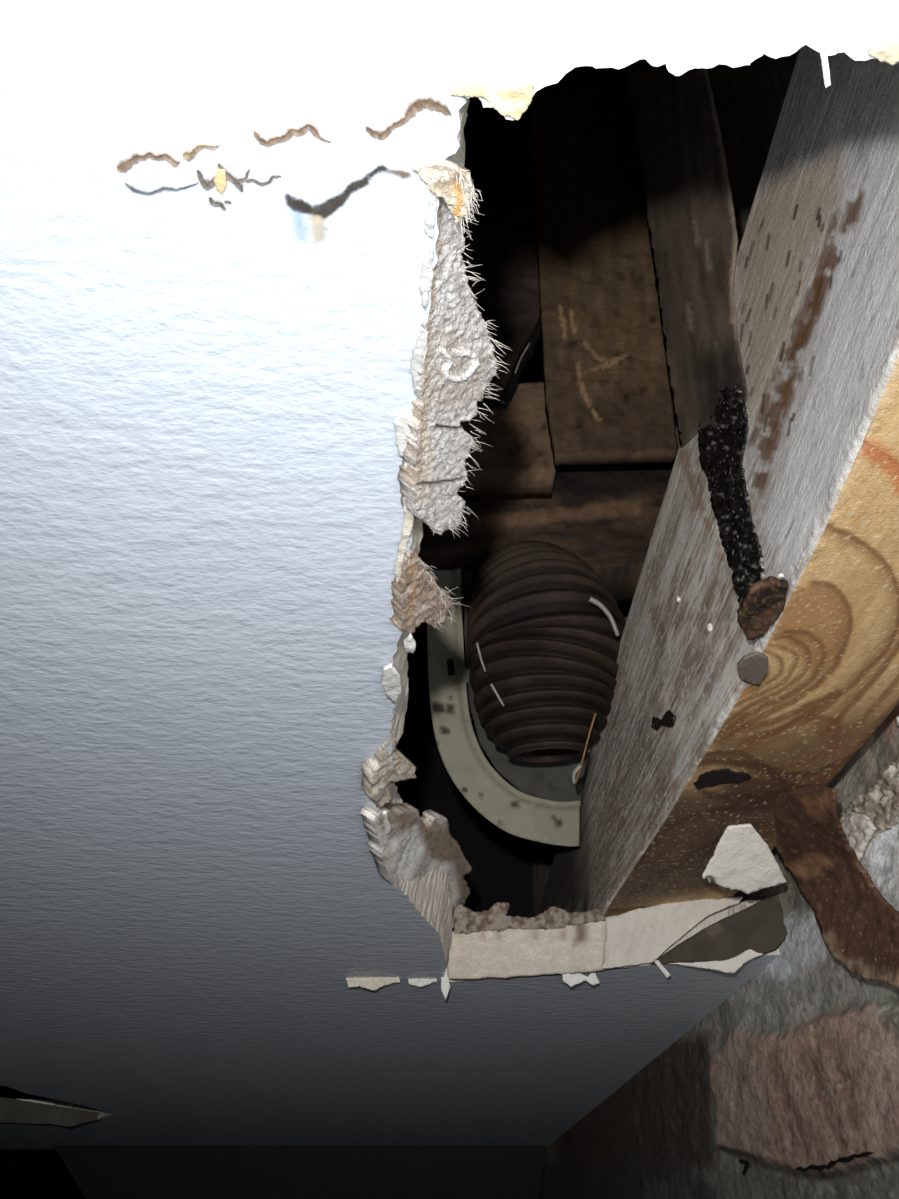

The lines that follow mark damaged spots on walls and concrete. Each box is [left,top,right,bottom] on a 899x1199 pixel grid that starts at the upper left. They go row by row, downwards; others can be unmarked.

peeling [820,53,831,88]
crack [117,96,452,218]
flaking render [389,188,510,654]
peeling [382,663,402,703]
flaking render [841,812,877,862]
flaking render [346,735,670,1000]
crack [738,1159,750,1175]
crack [795,1152,876,1171]